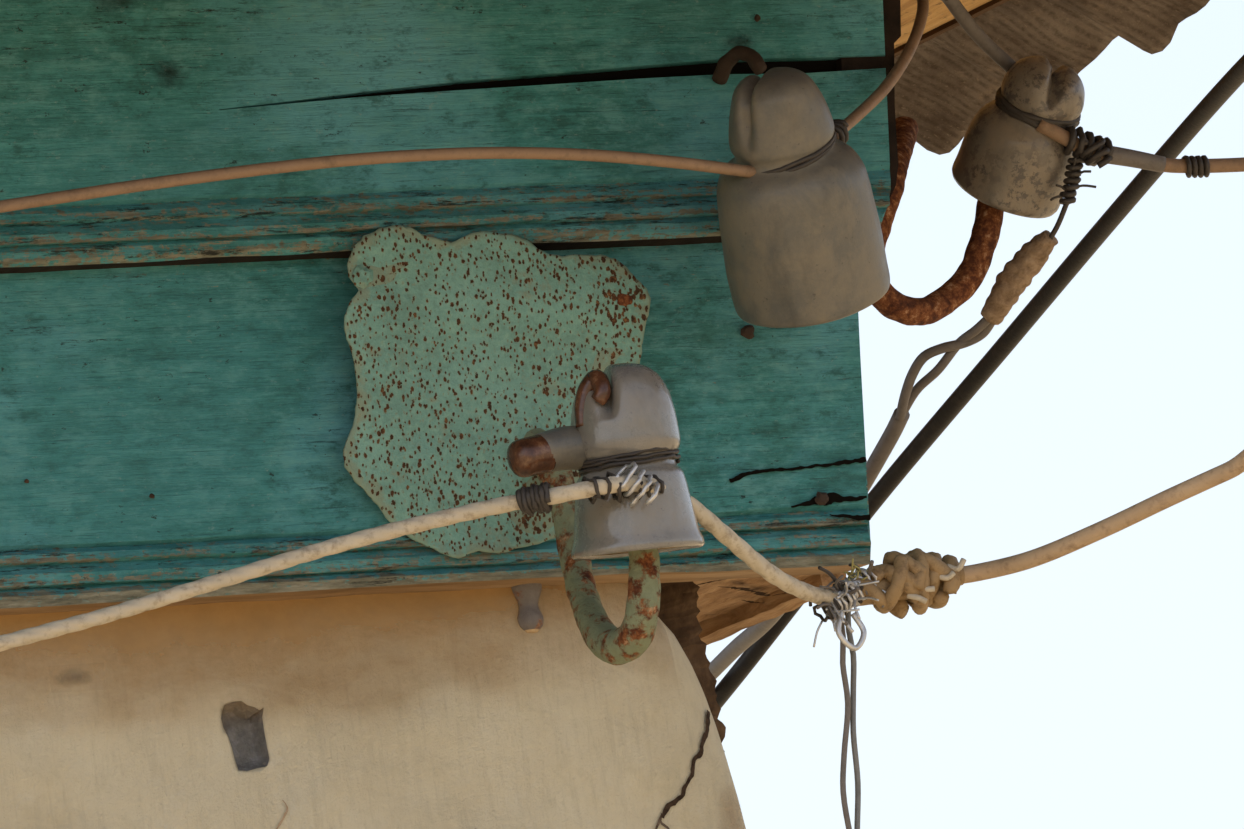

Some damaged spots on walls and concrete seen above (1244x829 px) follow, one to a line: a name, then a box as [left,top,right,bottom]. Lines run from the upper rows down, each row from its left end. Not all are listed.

rust [617,293,633,306]
crack [655,710,710,829]